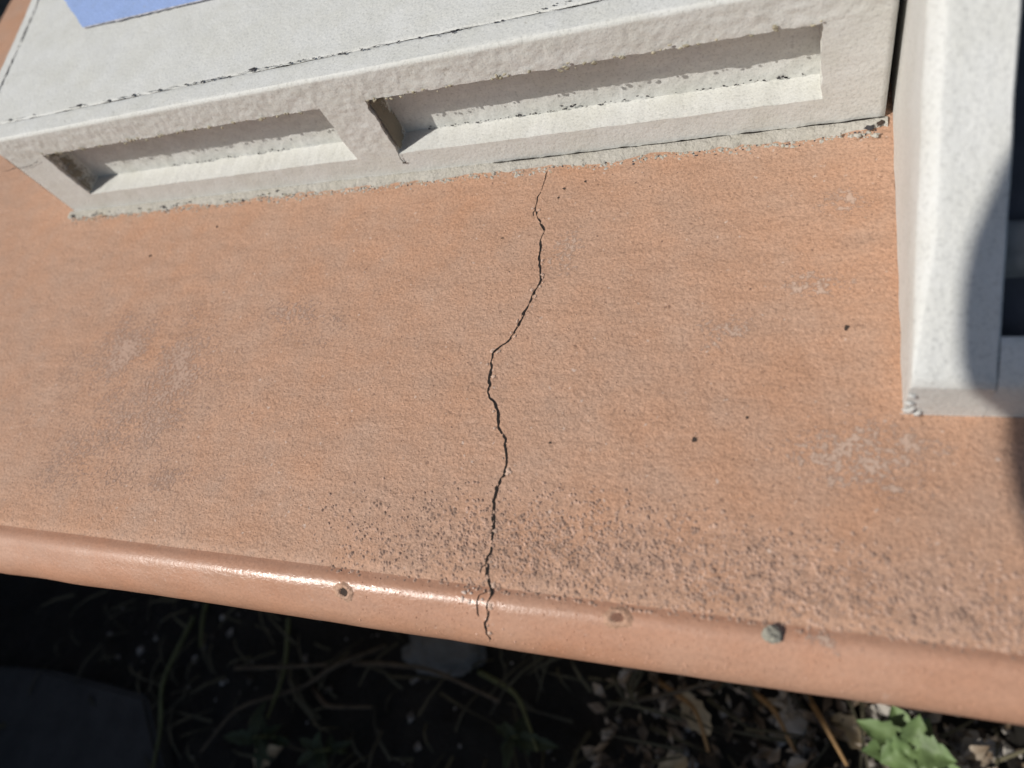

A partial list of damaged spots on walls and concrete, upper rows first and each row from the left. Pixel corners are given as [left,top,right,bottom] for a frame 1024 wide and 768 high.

crack [476,172,547,640]